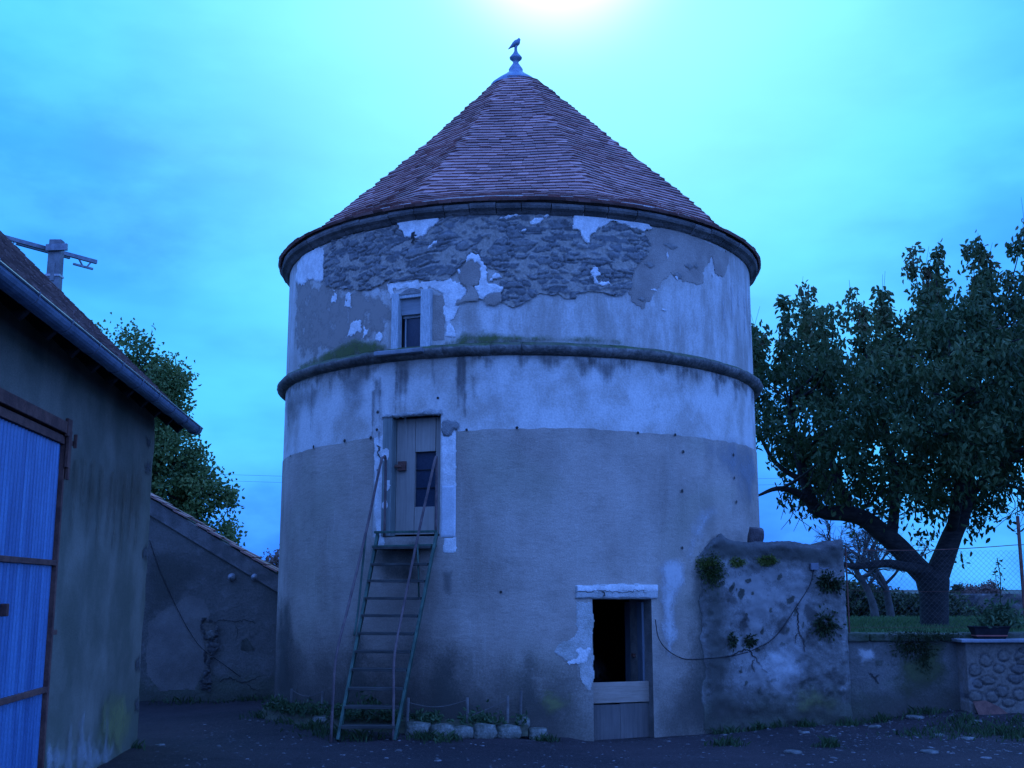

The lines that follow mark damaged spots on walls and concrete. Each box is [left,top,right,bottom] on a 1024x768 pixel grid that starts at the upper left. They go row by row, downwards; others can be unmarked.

flaking render [295,211,729,356]
leakage [457,358,466,400]
flaking render [554,601,595,690]